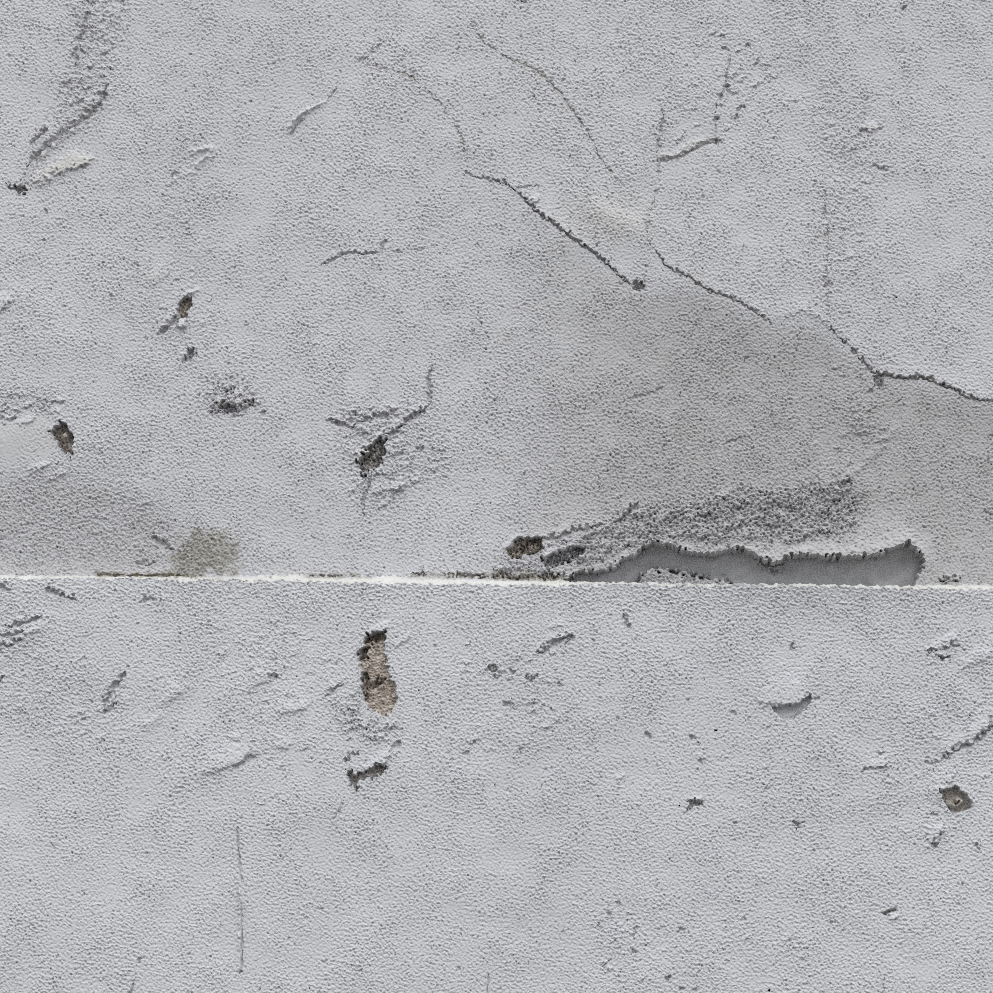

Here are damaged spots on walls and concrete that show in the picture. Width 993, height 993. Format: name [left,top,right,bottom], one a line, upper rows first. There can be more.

crack [283,87,339,139]
crack [317,237,454,268]
crack [353,20,993,408]
peeling [0,375,78,484]
hole [315,363,474,542]
spalling [486,413,993,587]
spalling [248,663,281,689]
spalling [273,615,417,793]
hole [923,770,977,851]